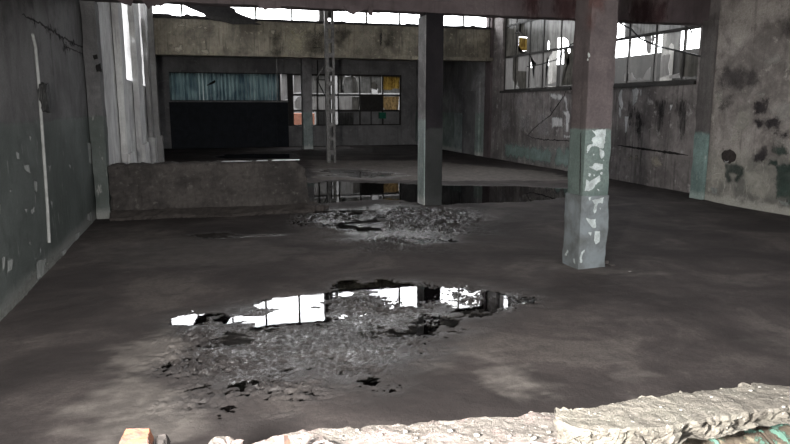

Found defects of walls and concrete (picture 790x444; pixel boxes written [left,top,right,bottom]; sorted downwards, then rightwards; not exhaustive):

leakage [618,87,642,138]
leakage [655,101,686,134]
leakage [754,98,787,137]
leakage [754,147,767,162]
peeling [585,129,606,244]
spalling [1,248,66,318]
peeling [735,423,790,444]